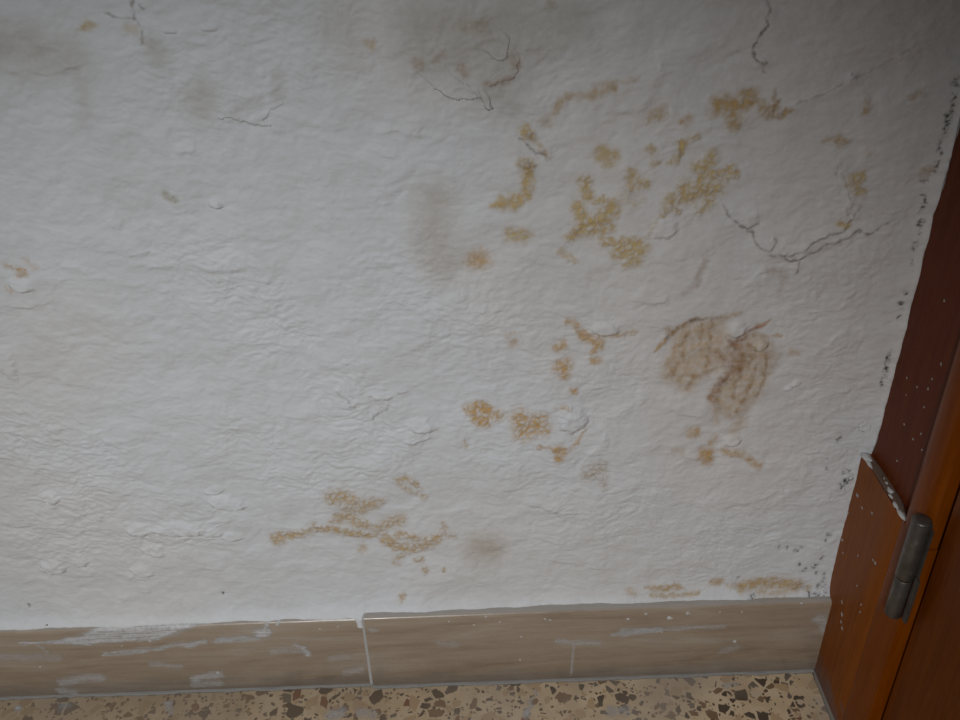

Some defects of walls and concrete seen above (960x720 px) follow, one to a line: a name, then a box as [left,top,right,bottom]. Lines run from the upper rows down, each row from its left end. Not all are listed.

damp [492,159,533,208]
damp [569,178,644,267]
peeling [861,452,873,469]
peeling [885,481,906,521]
damp [271,492,440,560]